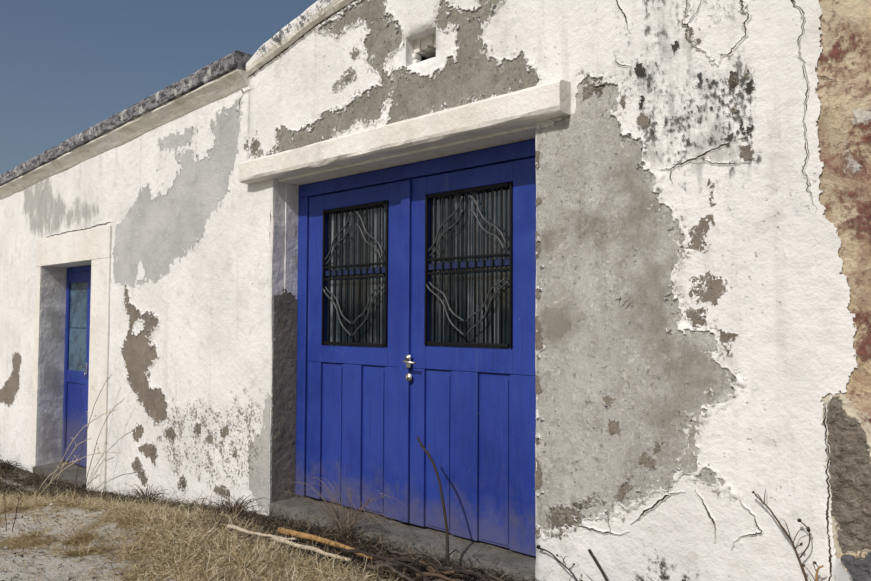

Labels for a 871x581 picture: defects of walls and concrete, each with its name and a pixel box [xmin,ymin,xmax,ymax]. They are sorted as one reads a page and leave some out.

crack [236,0,359,122]
peeling [243,0,550,160]
leakage [622,54,756,172]
crack [657,134,751,184]
crack [681,0,753,68]
peeling [721,62,756,161]
crack [789,0,844,355]
peeling [535,62,749,541]
peeling [0,349,24,408]
peeling [120,261,176,487]
crack [541,488,764,550]
spalling [820,391,871,581]